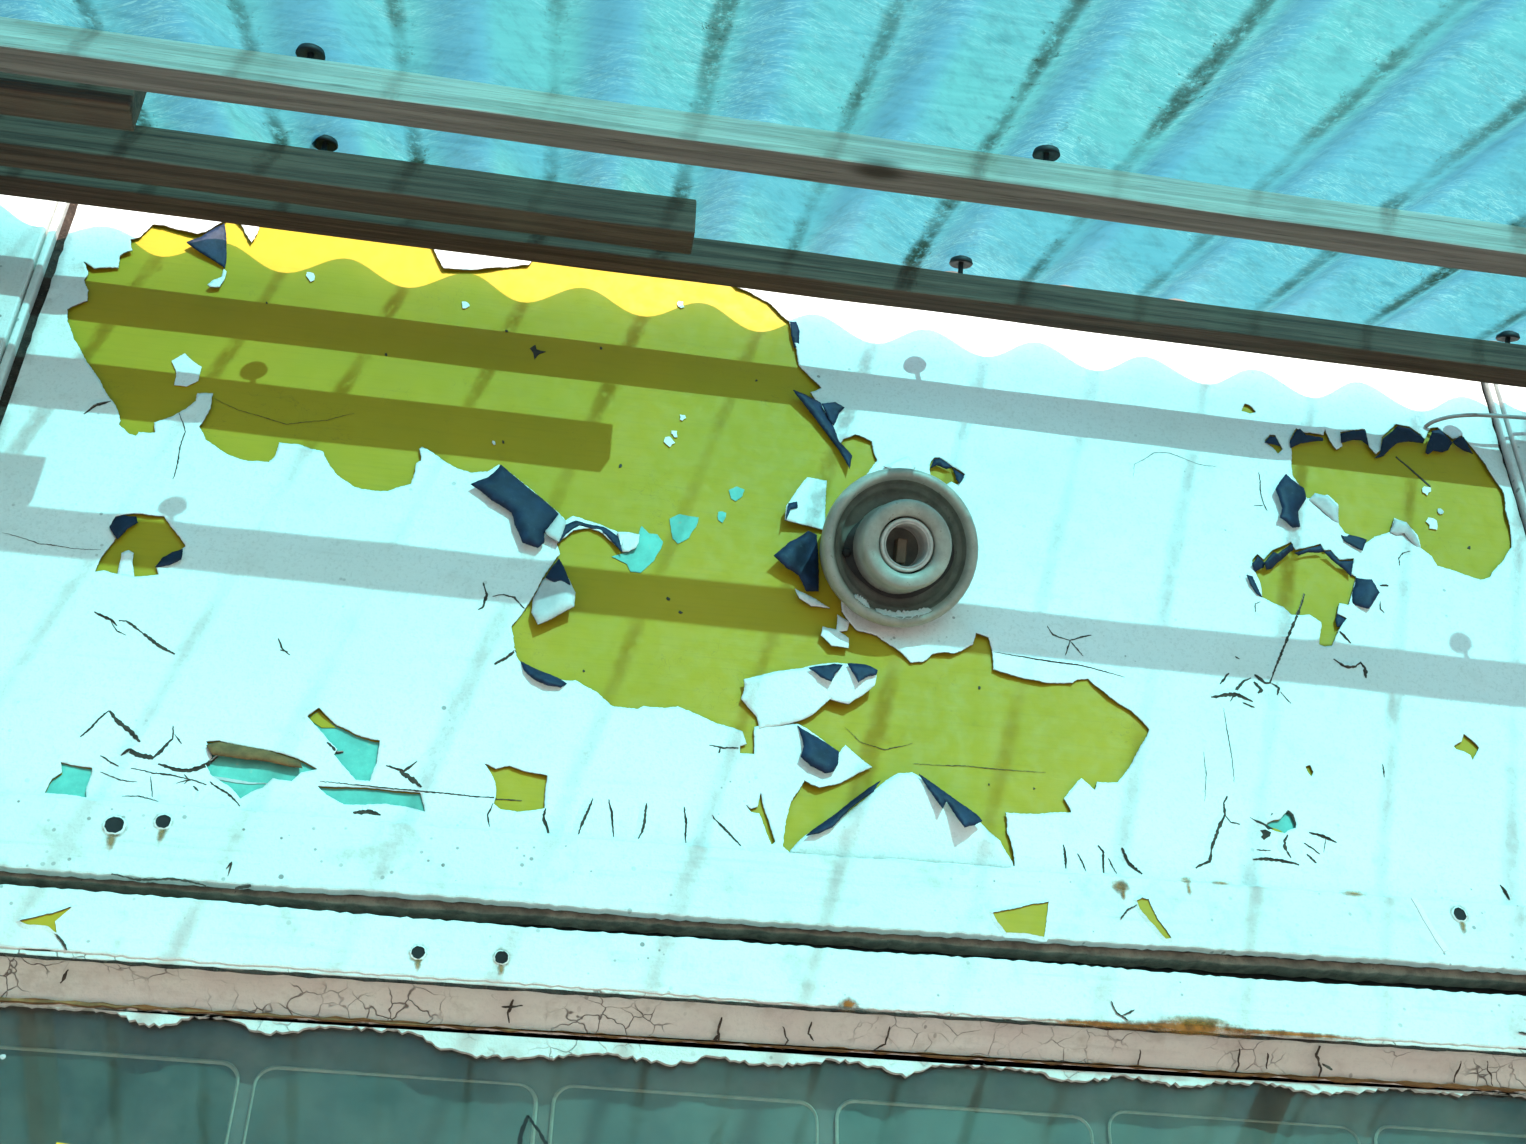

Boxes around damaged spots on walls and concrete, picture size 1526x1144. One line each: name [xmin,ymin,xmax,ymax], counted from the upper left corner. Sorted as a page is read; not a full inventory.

peeling [68,223,1148,868]
peeling [1247,426,1510,646]
crack [1333,629,1368,678]
crack [1192,593,1337,869]
crack [76,707,240,806]
peeling [1250,811,1296,840]
peeling [989,899,1052,942]
peeling [1132,895,1174,943]
crack [55,934,69,983]
crack [502,999,523,1023]
crack [1111,1001,1141,1065]
corrosion [1058,1017,1360,1041]